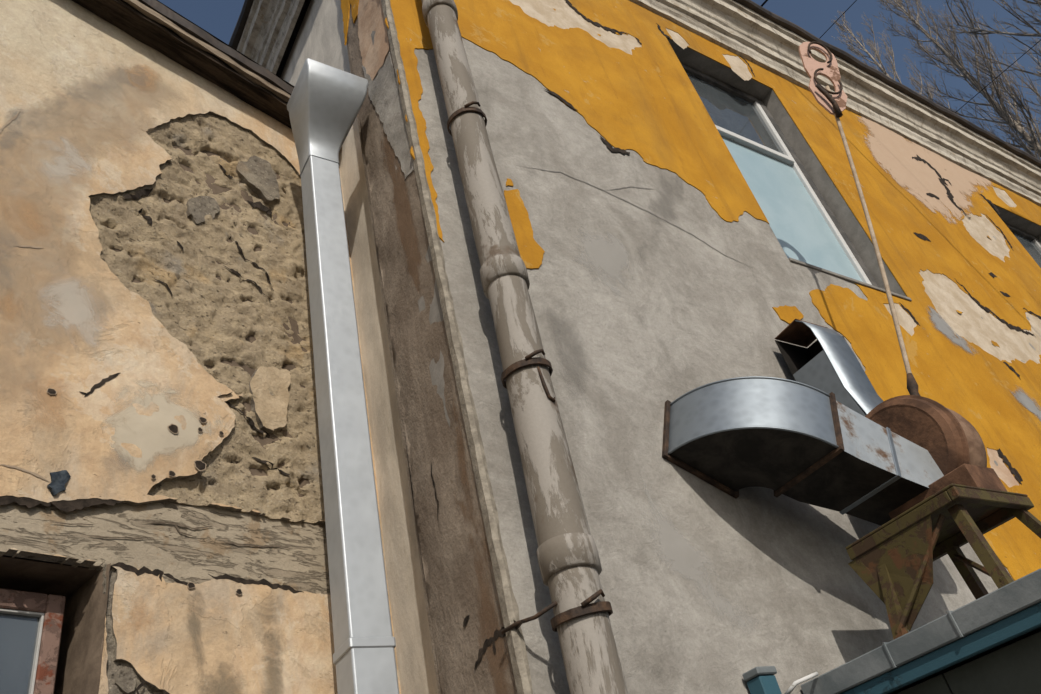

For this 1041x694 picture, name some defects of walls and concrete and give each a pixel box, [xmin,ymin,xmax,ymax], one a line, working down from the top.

peeling [509,0,642,55]
peeling [656,23,689,49]
peeling [723,55,755,80]
crack [518,165,744,264]
peeling [962,186,1017,262]
efflorescence [49,282,95,342]
spalling [89,113,325,524]
peeling [919,270,1041,380]
crack [79,373,119,397]
crack [431,464,439,518]
peeling [987,448,1023,487]
spalling [102,563,165,694]